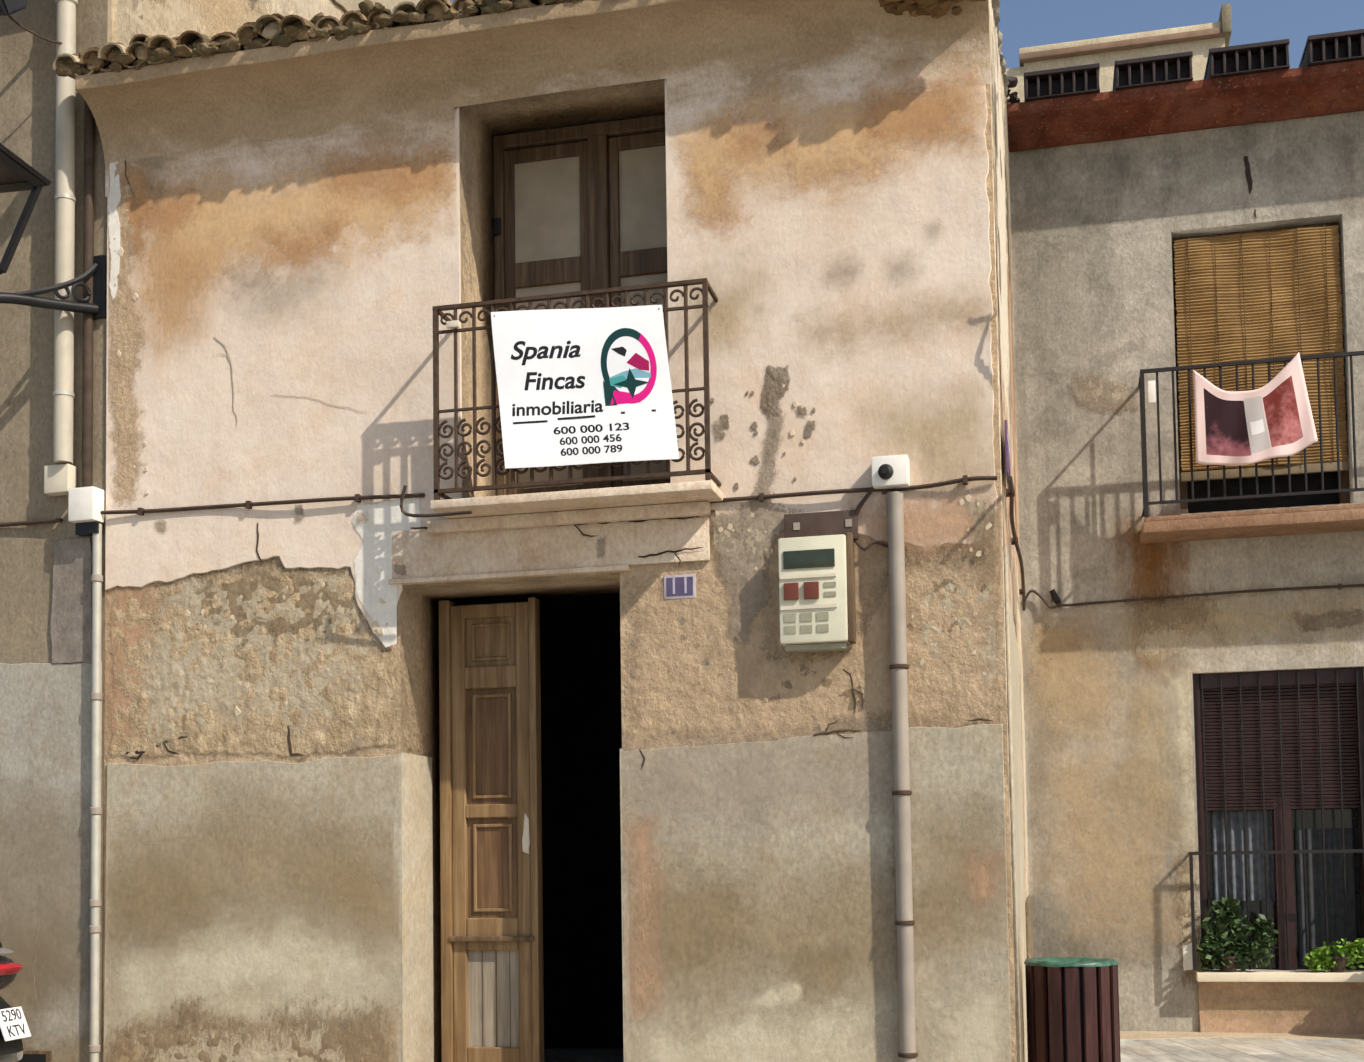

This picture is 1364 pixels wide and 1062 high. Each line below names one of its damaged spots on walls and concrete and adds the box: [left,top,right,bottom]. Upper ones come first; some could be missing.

leakage [680,82,979,222]
leakage [141,150,455,336]
crack [214,337,238,426]
flaking render [904,4,1111,734]
crack [559,516,704,569]
flaking render [626,365,892,750]
flaking render [107,562,398,761]
crack [813,669,863,738]
leakage [116,913,398,1028]